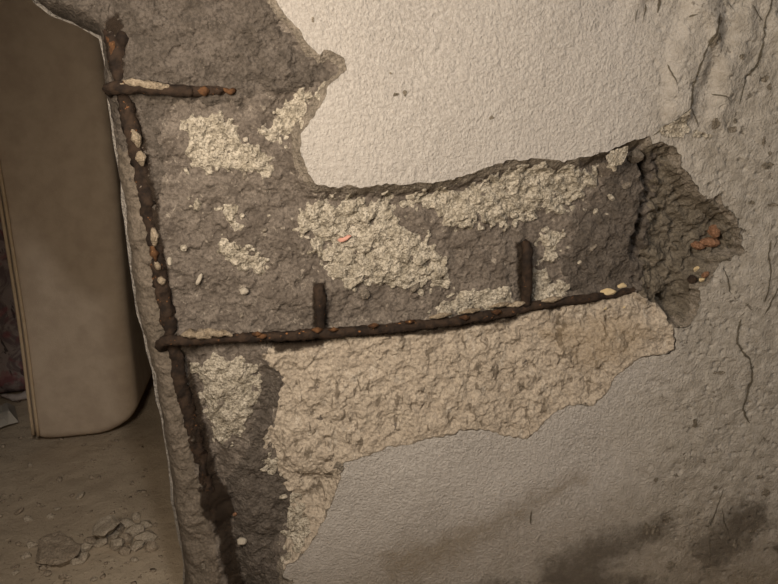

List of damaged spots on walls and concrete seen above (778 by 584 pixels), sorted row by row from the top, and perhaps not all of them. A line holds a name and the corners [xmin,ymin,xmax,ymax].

corrosion [105,14,129,81]
crack [654,0,773,135]
flaking render [708,13,722,48]
peeling [659,109,721,138]
corrosion [135,108,169,279]
spalling [651,141,745,327]
spalling [37,0,676,554]
corrosion [515,242,523,298]
corrosion [252,282,339,352]
corrosion [360,309,517,338]
crack [736,312,753,423]